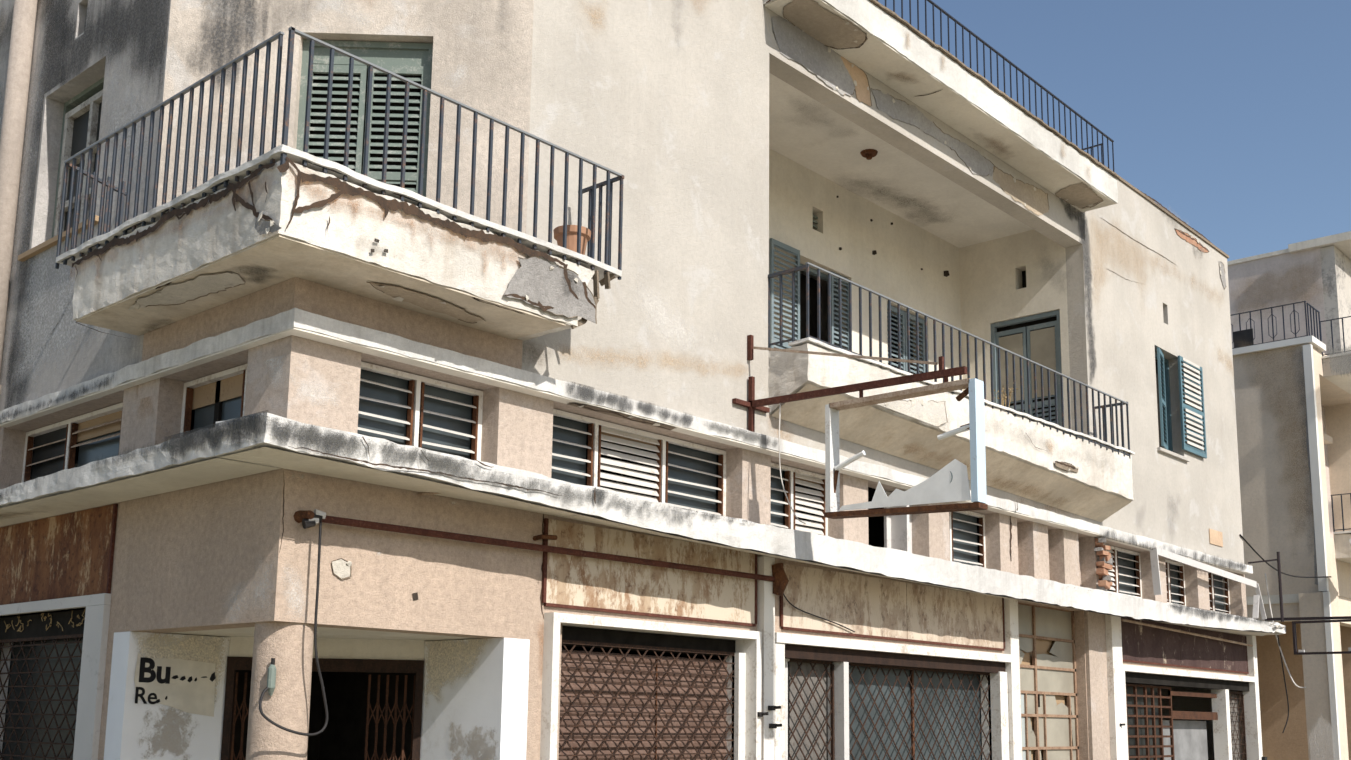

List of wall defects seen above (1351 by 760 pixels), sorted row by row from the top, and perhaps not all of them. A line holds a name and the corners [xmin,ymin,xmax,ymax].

damp [192,0,267,83]
peeling [771,0,1104,216]
spalling [504,256,597,324]
corrosion [293,509,775,582]
peeling [141,708,193,760]
peeling [449,723,496,760]